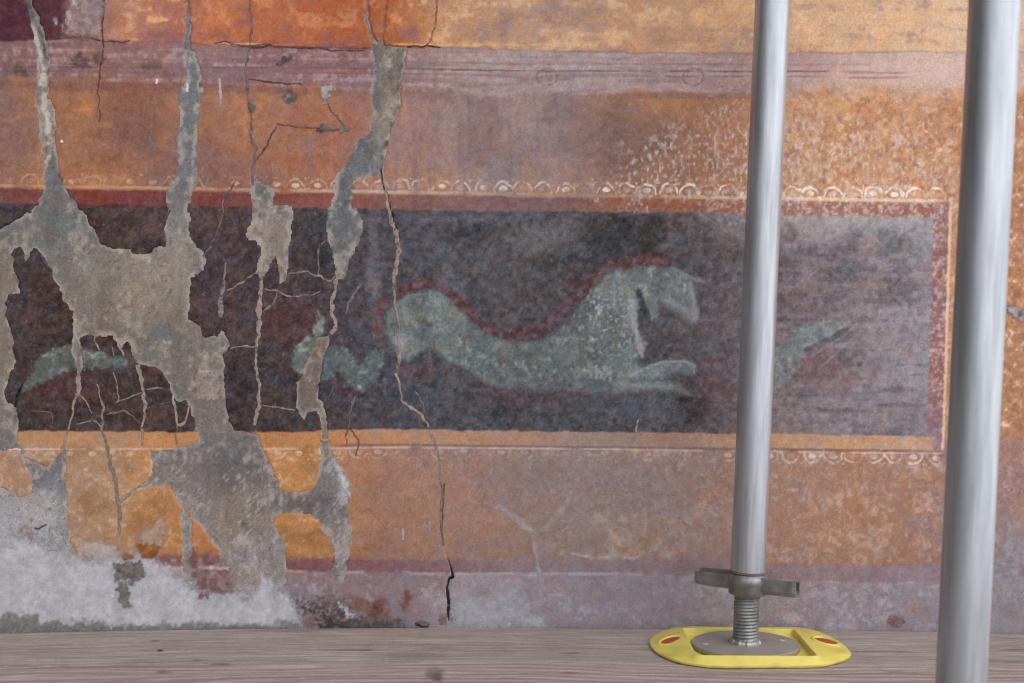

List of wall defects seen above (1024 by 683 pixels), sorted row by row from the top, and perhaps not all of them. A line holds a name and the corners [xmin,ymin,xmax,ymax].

spalling [0,0,352,602]
water stain [0,518,406,633]
crack [203,0,364,426]
water stain [336,465,350,496]
spalling [326,0,407,279]
crack [380,161,454,621]